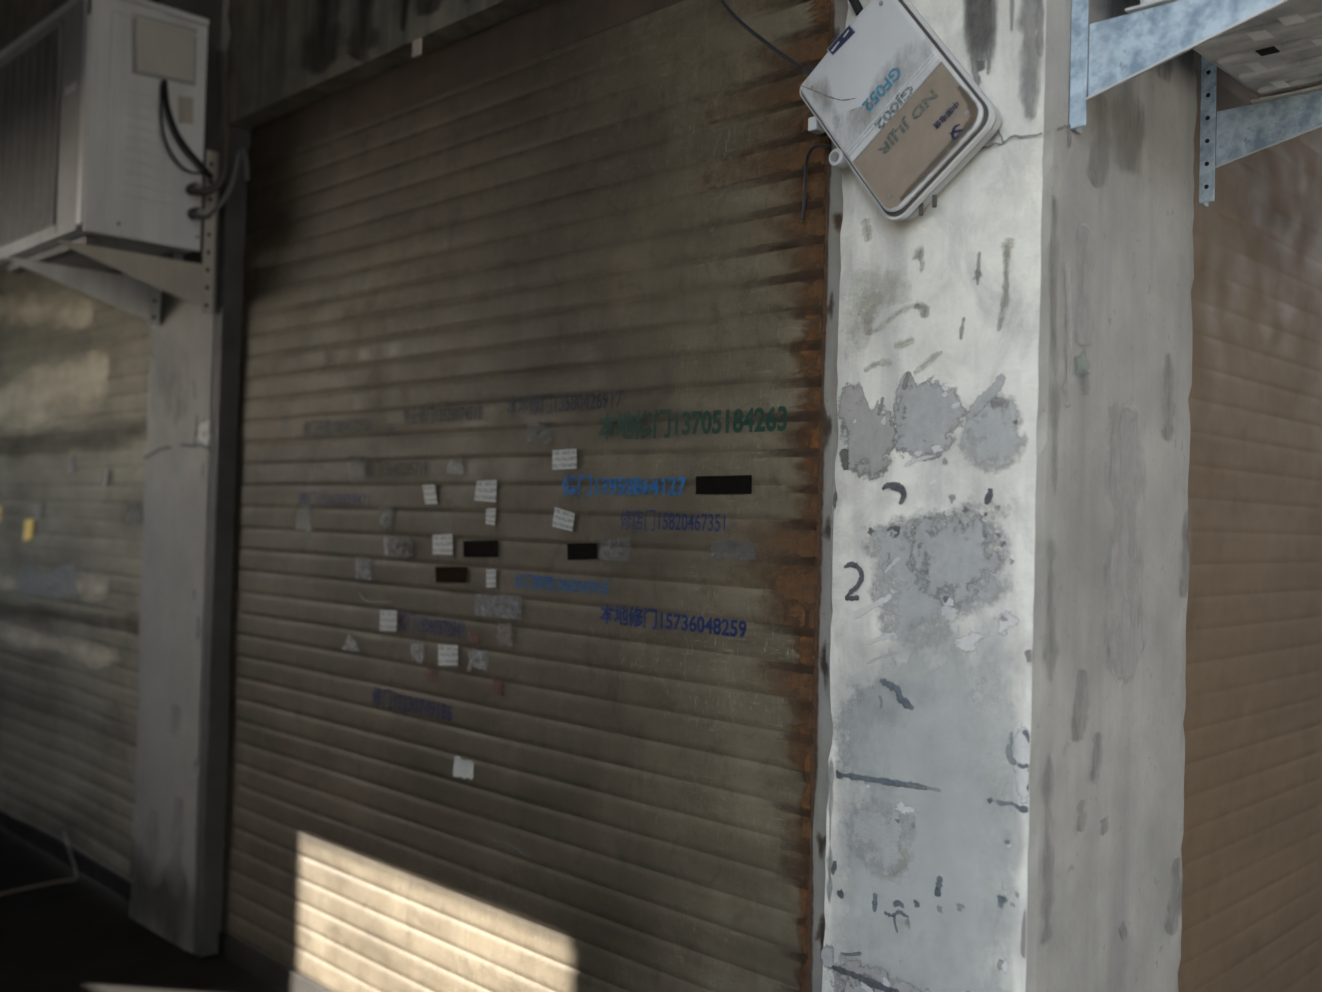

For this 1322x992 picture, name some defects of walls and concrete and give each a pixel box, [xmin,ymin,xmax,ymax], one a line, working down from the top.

water stain [965,0,1043,117]
rust [737,0,843,992]
peeling [831,371,1027,608]
crack [836,770,940,792]
peeling [821,488,1030,992]
crack [831,952,899,992]
crack [884,910,909,933]